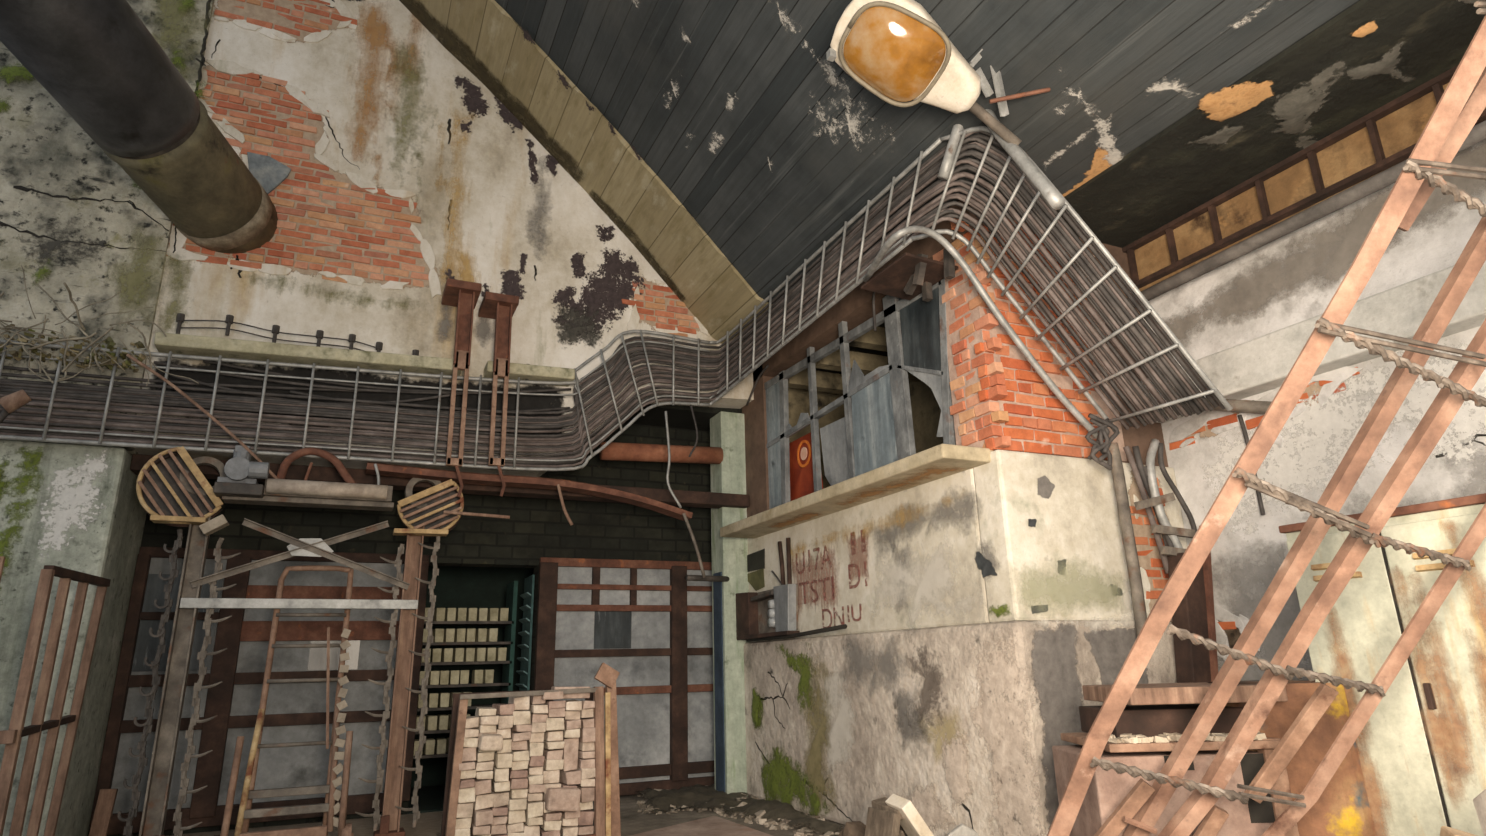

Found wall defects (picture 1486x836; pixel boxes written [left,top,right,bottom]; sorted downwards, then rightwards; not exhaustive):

crack [0,186,177,253]
crack [195,0,221,98]
spalling [213,0,357,43]
spalling [166,60,457,298]
damp [395,48,419,159]
damp [399,0,685,301]
spalling [1187,41,1413,149]
damp [556,304,603,347]
peeling [551,224,709,338]
peeling [1227,350,1405,542]
damp [751,688,763,729]
damp [822,639,957,773]